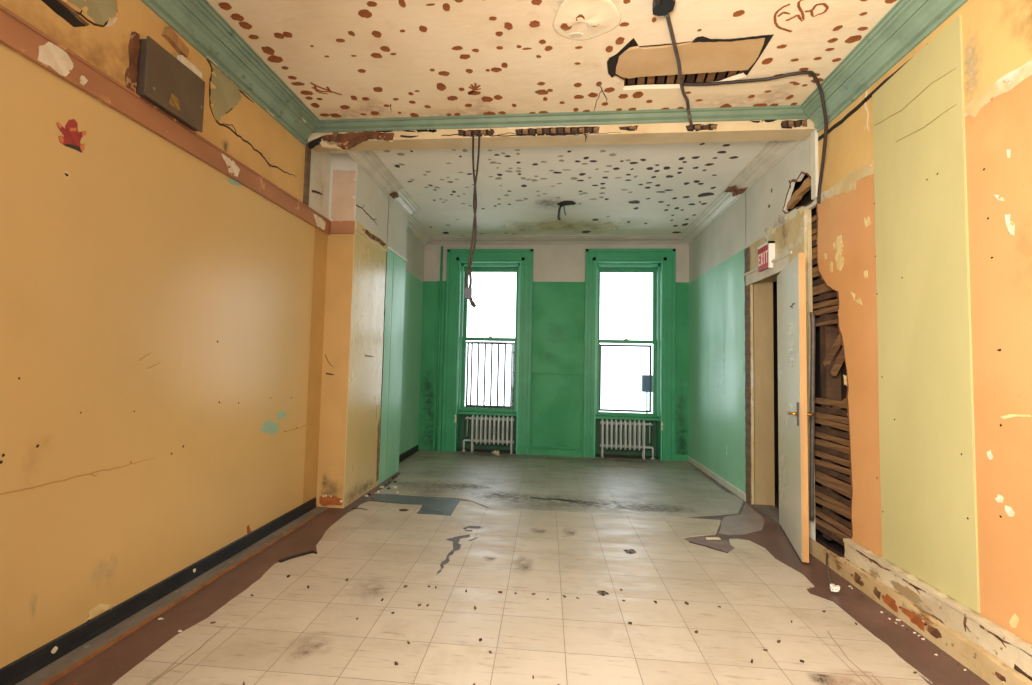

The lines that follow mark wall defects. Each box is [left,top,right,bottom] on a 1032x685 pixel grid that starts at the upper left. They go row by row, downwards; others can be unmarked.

peeling [37,42,88,86]
crack [206,59,323,195]
peeling [218,1,431,118]
flaking render [319,129,439,168]
peeling [489,16,513,50]
peeling [529,82,553,114]
peeling [605,22,629,53]
peeling [560,82,684,112]
peeling [964,59,1032,117]
flaking render [407,124,738,234]
peeling [765,161,874,235]
peeling [851,572,942,639]